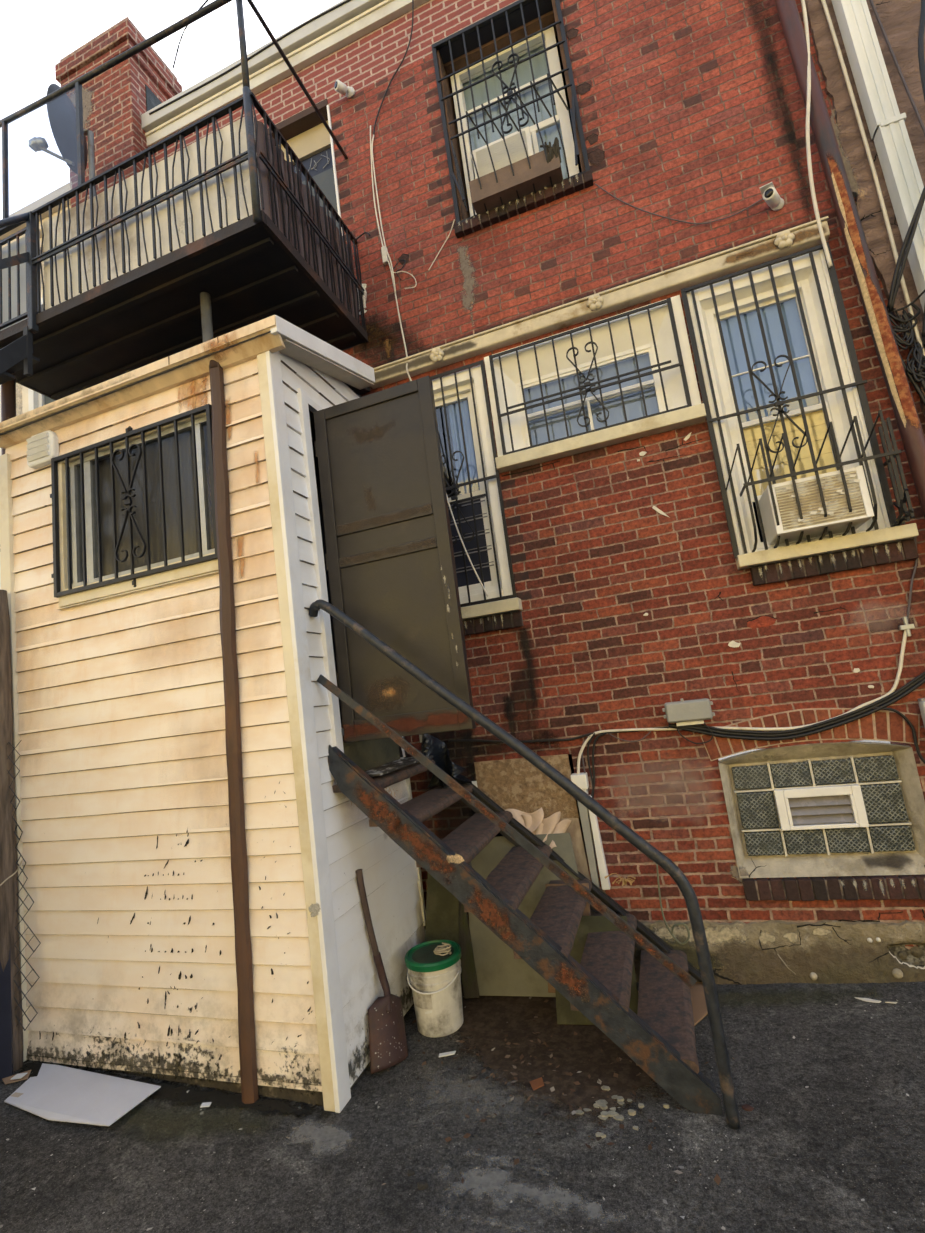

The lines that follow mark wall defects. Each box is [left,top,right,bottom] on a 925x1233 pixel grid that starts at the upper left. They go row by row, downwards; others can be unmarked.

rust [183,378,206,409]
damp [506,630,537,737]
rust [356,782,464,883]
rust [469,888,516,939]
crack [699,968,742,985]
crack [759,909,925,972]
spalling [887,943,925,969]
damp [26,1030,241,1084]
damp [257,1046,320,1095]